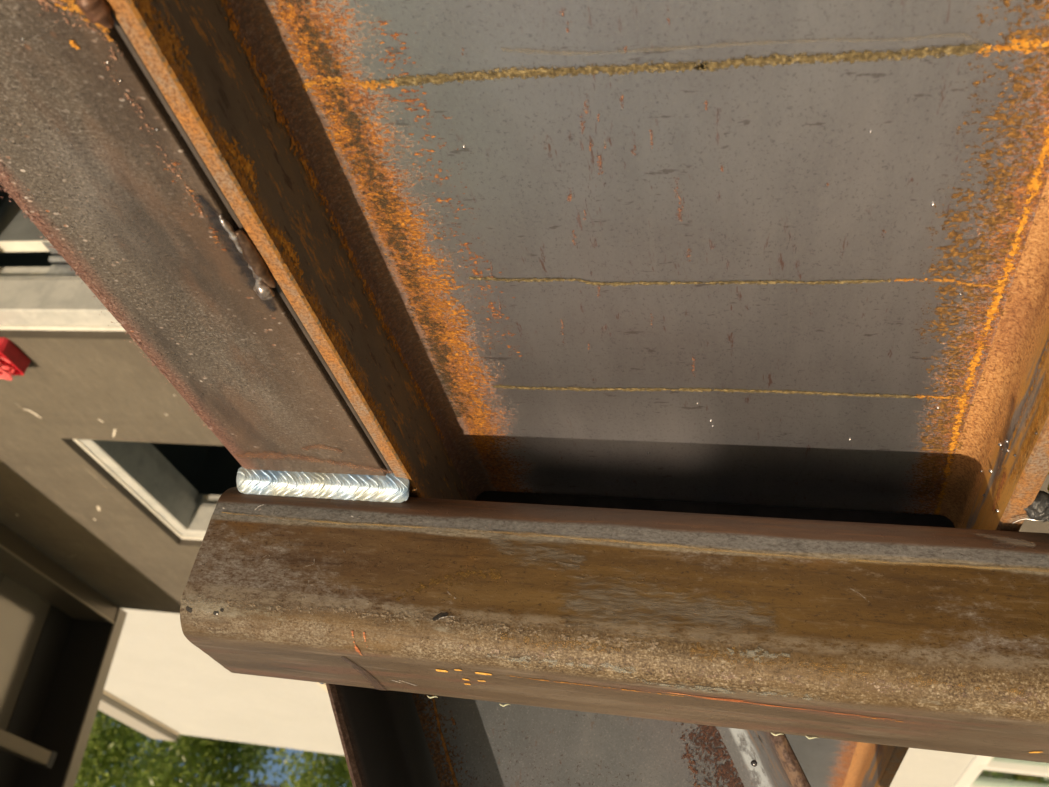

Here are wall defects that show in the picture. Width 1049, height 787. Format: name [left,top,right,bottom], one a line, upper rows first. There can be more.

rust [38,0,123,81]
rust [0,165,221,438]
rust [124,0,444,473]
rust [269,0,521,456]
rust [910,0,1049,515]
rust [856,560,1004,569]
rust [459,632,1046,722]
rust [412,693,477,787]
rust [675,723,744,787]